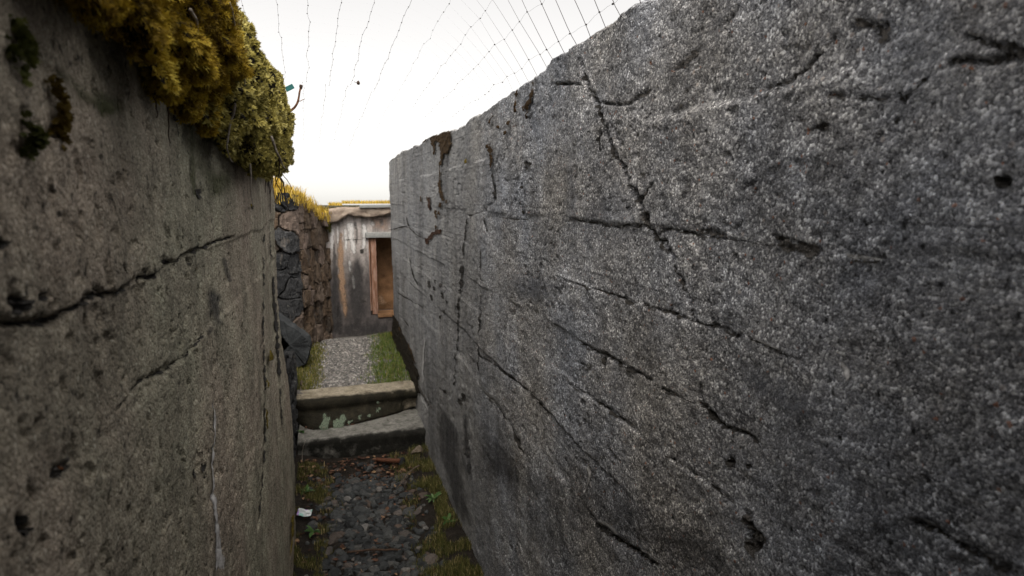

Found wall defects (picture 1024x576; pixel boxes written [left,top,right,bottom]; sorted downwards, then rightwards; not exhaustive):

crack [751,36,837,89]
crack [855,78,927,136]
crack [555,63,799,363]
crack [3,237,230,327]
crack [390,217,424,326]
crack [453,173,546,453]
crack [118,335,204,408]
crack [569,343,764,503]
crack [595,519,655,563]
crack [914,521,1011,572]